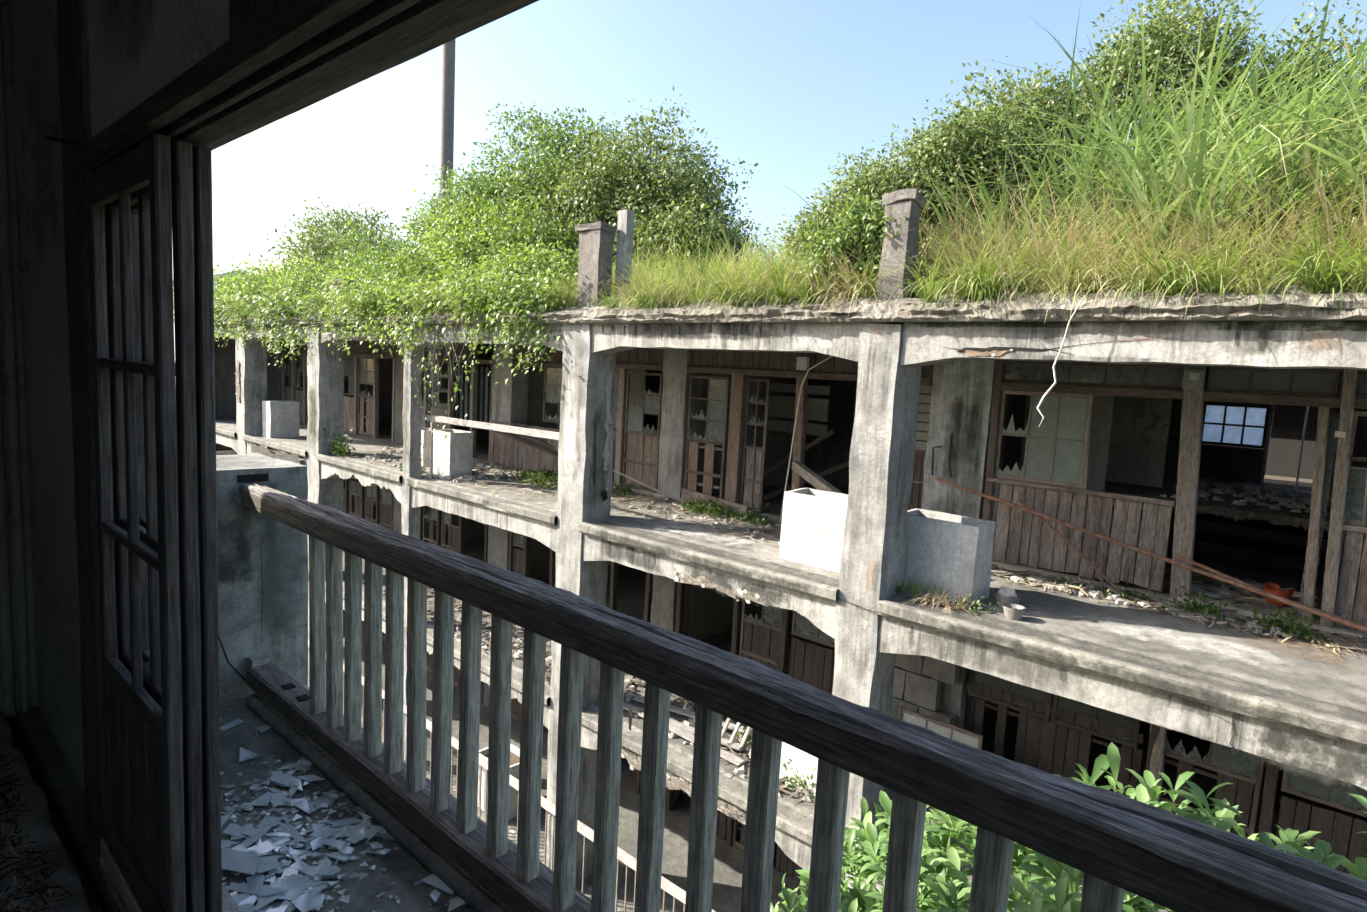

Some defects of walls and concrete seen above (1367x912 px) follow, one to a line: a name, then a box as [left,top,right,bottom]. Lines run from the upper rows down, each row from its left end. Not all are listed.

crack [944,338,1181,355]